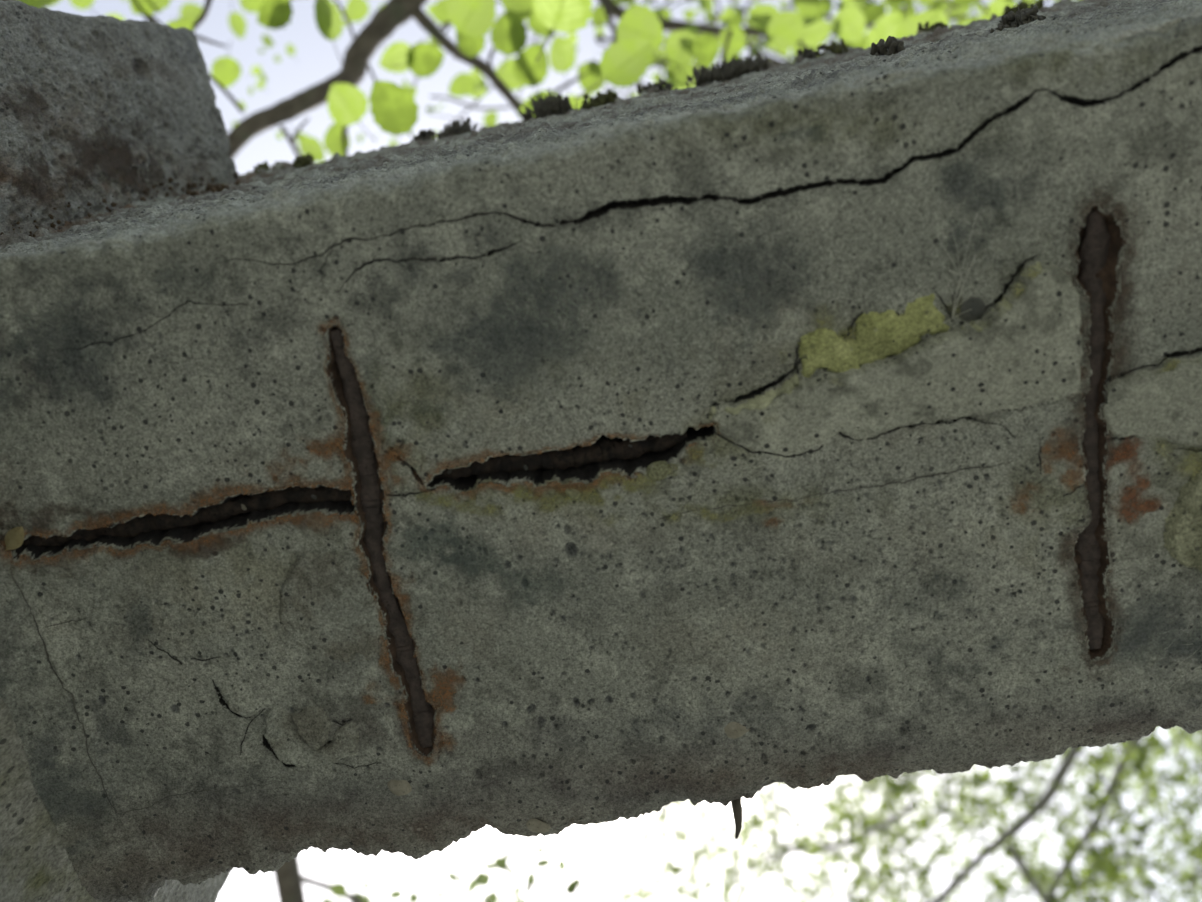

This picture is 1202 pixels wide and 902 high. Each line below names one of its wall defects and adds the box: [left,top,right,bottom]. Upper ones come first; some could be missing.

crack [224,47,1202,294]
crack [831,312,863,338]
crack [935,291,953,322]
crack [985,254,1037,311]
crack [1102,348,1202,385]
crack [384,451,436,497]
corrosion [420,423,718,497]
corrosion [1042,210,1160,670]
corrosion [0,328,463,749]